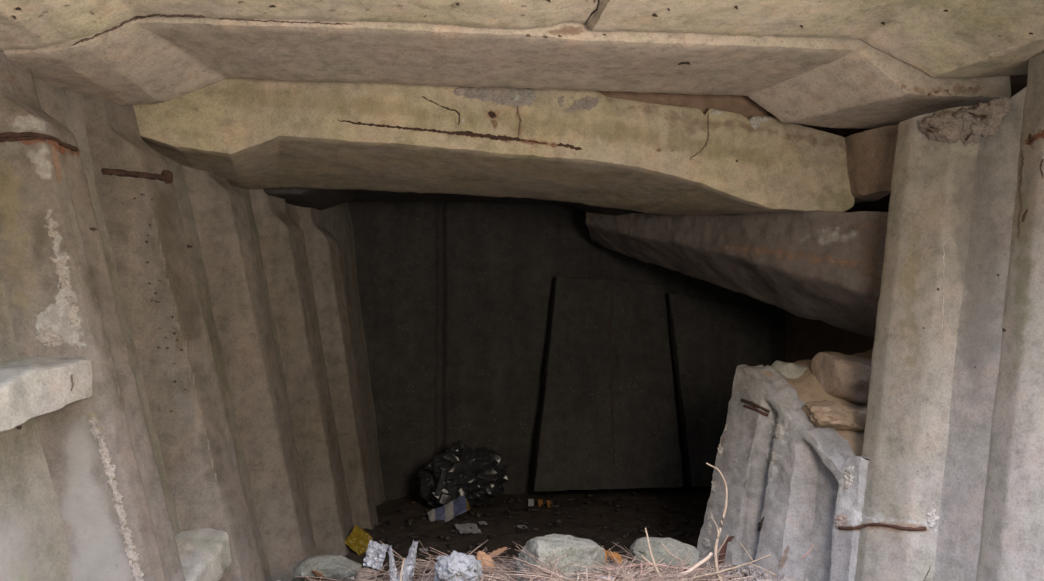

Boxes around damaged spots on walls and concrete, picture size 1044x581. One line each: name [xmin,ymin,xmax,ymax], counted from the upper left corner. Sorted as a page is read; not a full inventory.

crack [72,14,351,46]
spalling [918,97,1011,146]
corrosion [1025,130,1044,145]
corrosion [0,132,80,167]
corrosion [103,168,173,184]
corrosion [741,398,770,417]
corrosion [838,523,927,531]